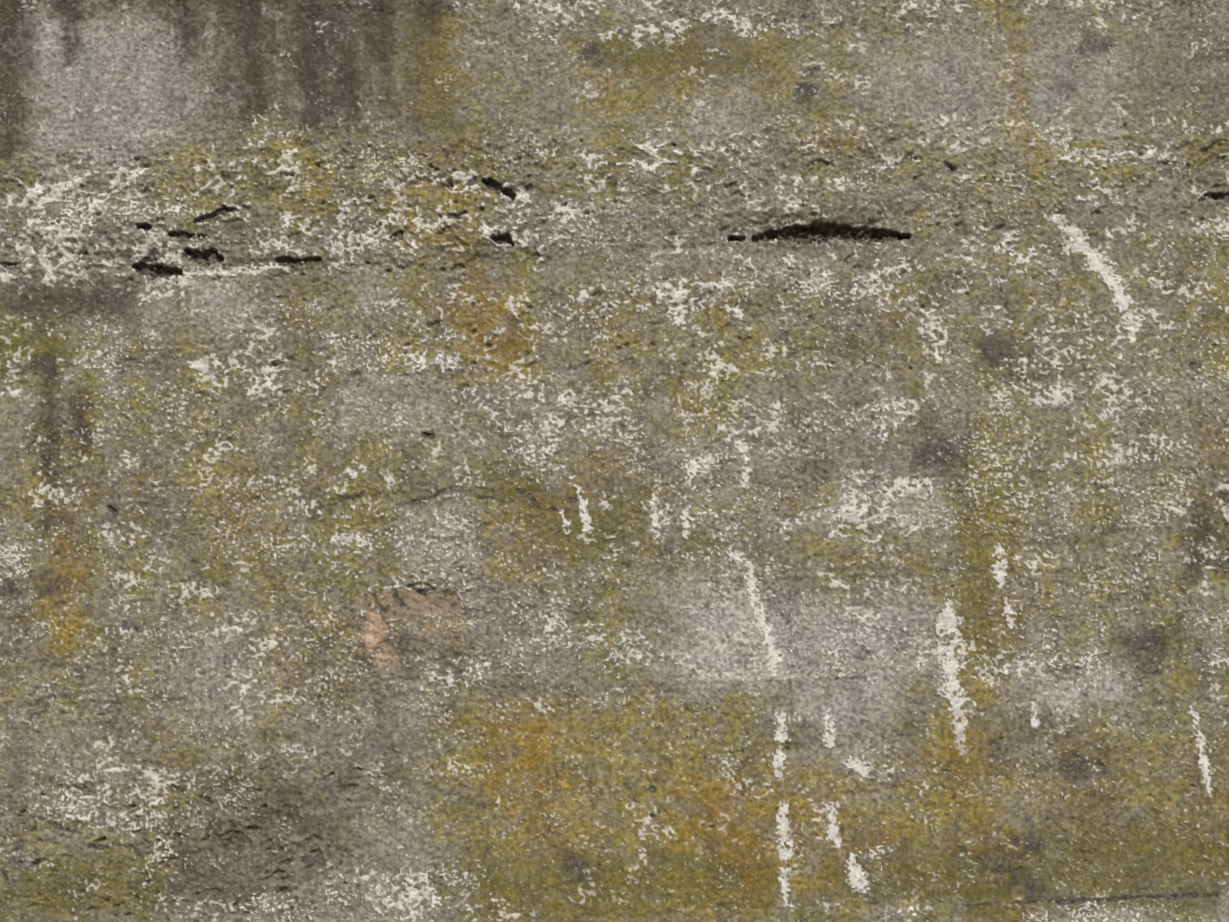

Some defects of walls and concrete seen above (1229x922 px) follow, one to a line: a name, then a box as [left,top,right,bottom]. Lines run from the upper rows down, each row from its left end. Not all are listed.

leakage [1050,209,1144,343]
leakage [559,484,594,534]
leakage [677,450,715,539]
leakage [735,439,752,488]
leakage [726,544,787,677]
leakage [990,542,1014,629]
leakage [931,593,976,755]
leakage [772,710,791,777]
leakage [843,750,875,778]
leakage [1187,706,1213,797]
leakage [776,801,796,911]
leakage [826,802,869,900]